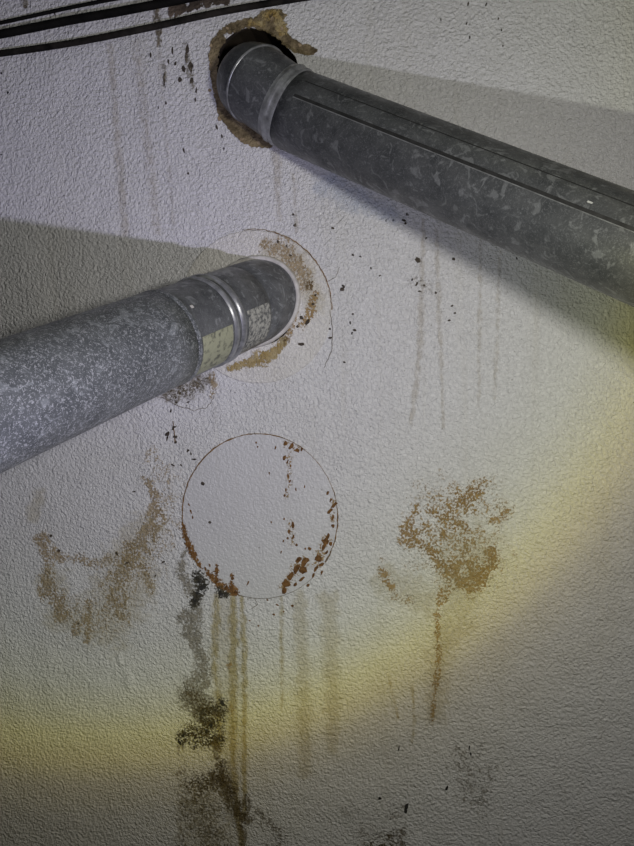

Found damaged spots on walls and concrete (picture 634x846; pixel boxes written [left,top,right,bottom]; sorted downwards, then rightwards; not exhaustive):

corrosion [227,317,297,372]
corrosion [274,441,305,497]
water stain [33,448,182,644]
corrosion [181,523,249,596]
corrosion [280,491,338,594]
water stain [175,550,285,846]